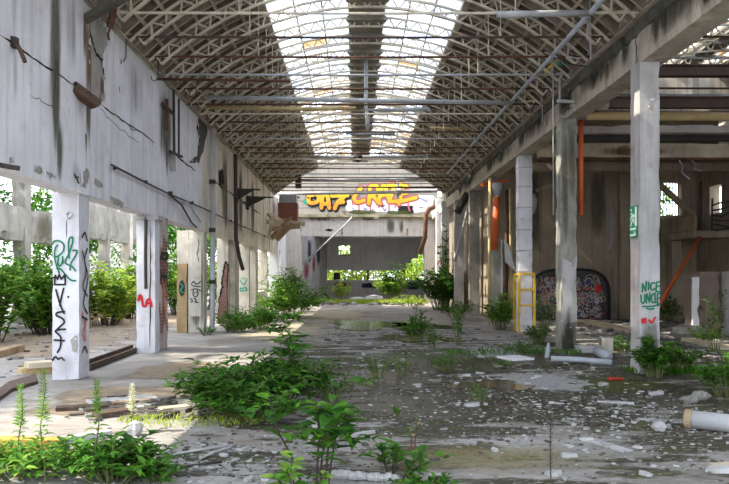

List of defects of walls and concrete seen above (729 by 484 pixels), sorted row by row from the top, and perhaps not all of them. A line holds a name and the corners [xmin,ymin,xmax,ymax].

water stain [51,0,62,173]
spalling [89,18,109,106]
water stain [580,42,628,87]
spalling [189,117,207,165]
spalling [34,164,56,179]
spalling [82,168,104,189]
spalling [160,256,170,289]
flaking render [218,261,229,323]
water stain [322,314,729,424]